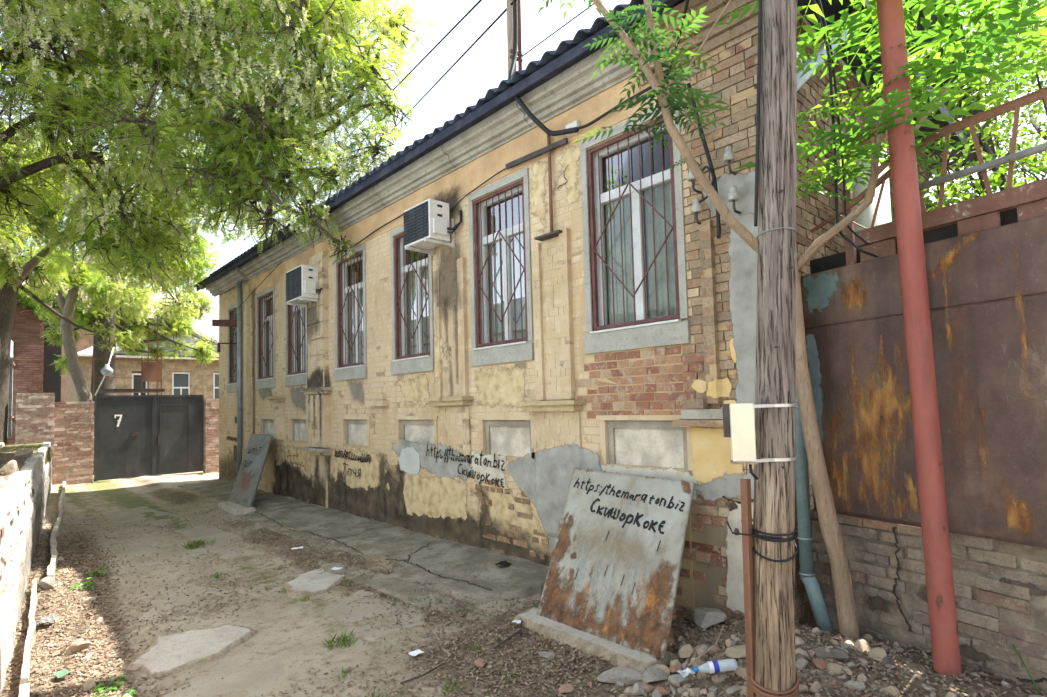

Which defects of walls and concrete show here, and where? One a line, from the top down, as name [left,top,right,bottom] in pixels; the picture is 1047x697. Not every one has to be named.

flaking render [577,28,758,484]
crack [0,497,38,637]
crack [253,511,369,553]
damp [273,369,551,567]
crack [386,544,491,591]
flaking render [329,445,549,560]
spalling [677,496,754,619]
corrosion [827,366,912,513]
crack [892,526,912,632]